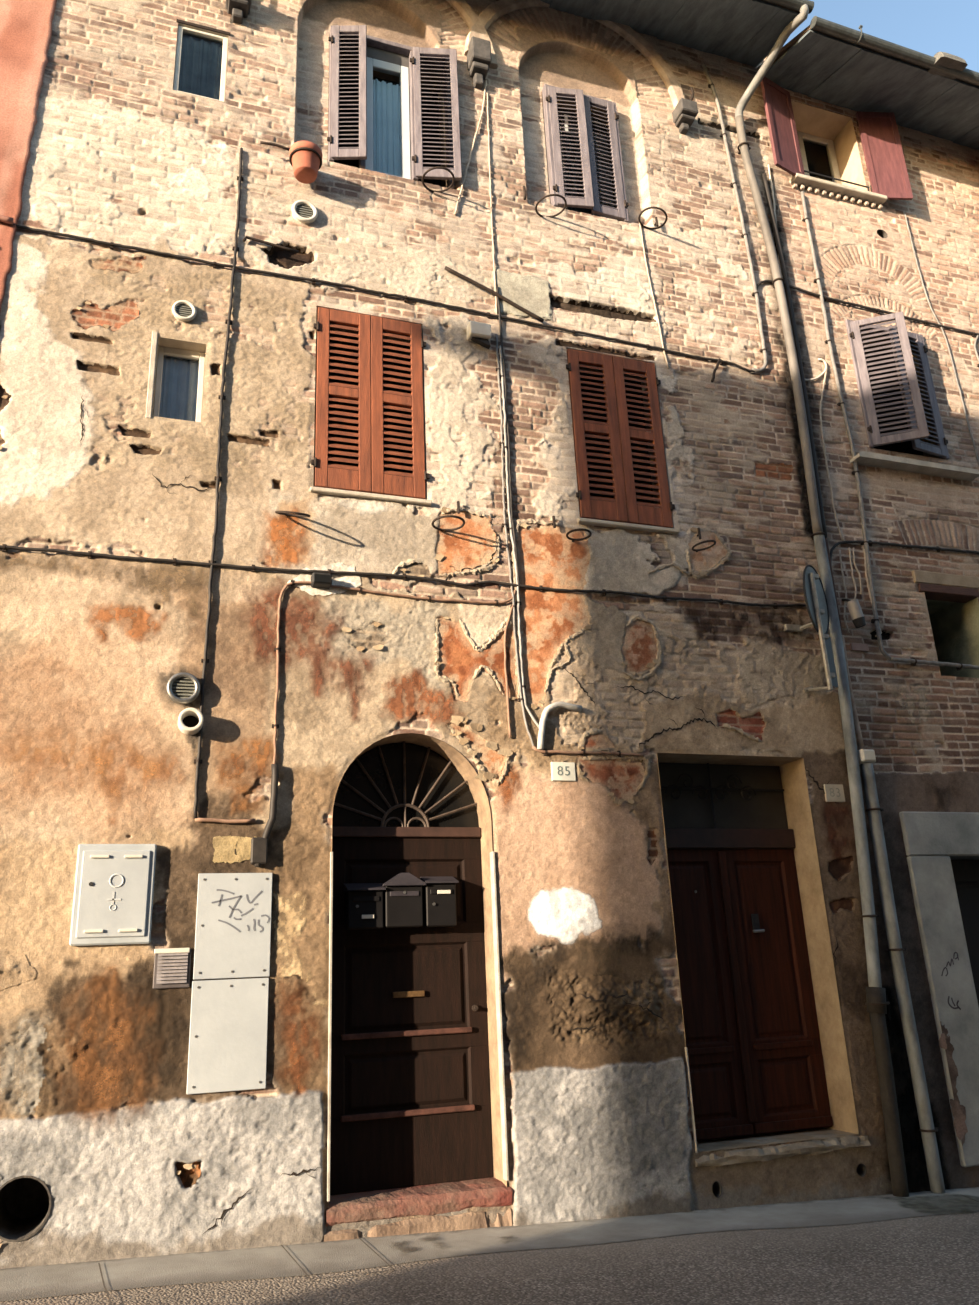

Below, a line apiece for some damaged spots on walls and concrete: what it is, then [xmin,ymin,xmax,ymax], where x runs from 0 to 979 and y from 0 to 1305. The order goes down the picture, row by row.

flaking render [264,243,314,269]
flaking render [72,299,139,345]
flaking render [76,360,120,376]
flaking render [0,385,12,411]
flaking render [648,527,732,579]
flaking render [392,507,592,786]
crack [564,668,715,747]
leakage [502,928,654,1065]
leakage [135,979,183,1100]
flaking render [176,1161,201,1188]
crack [282,1167,322,1178]
crack [203,1190,249,1234]